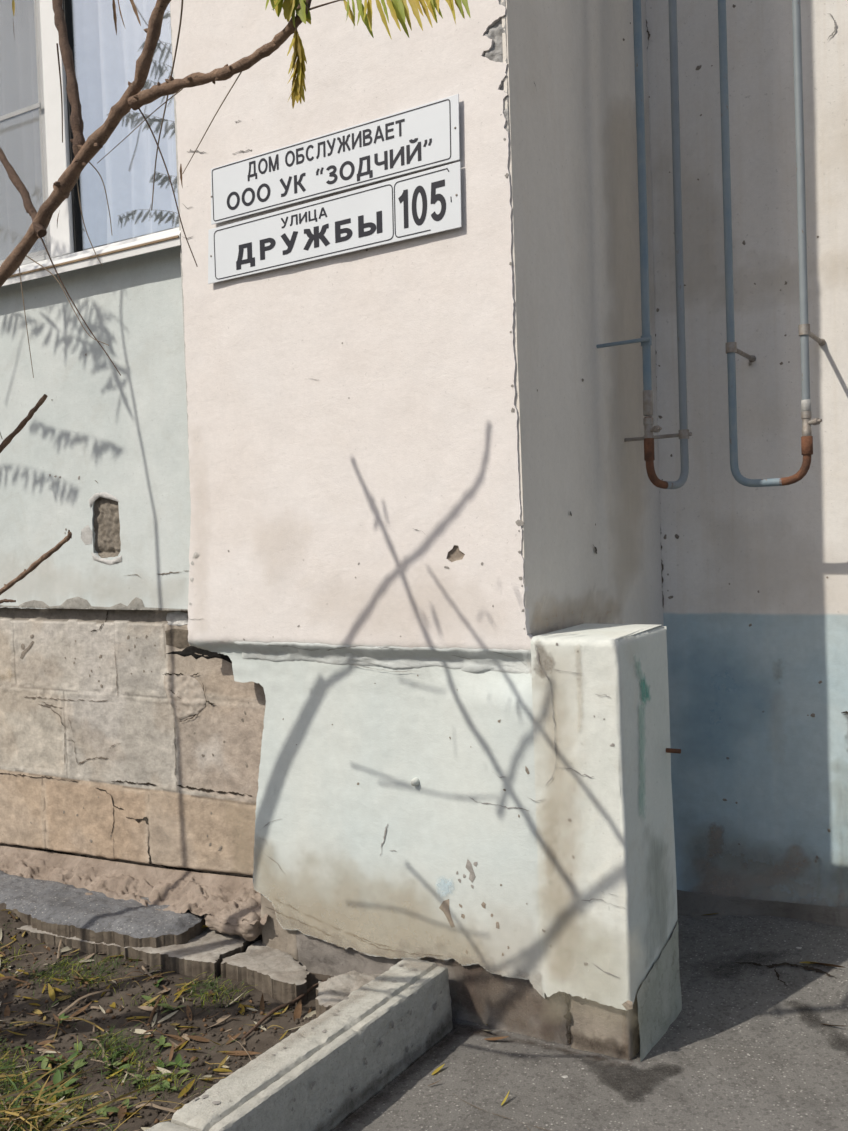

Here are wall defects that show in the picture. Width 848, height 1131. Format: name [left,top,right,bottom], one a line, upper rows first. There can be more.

spalling [483,0,509,140]
spalling [444,545,465,569]
crack [0,658,285,878]